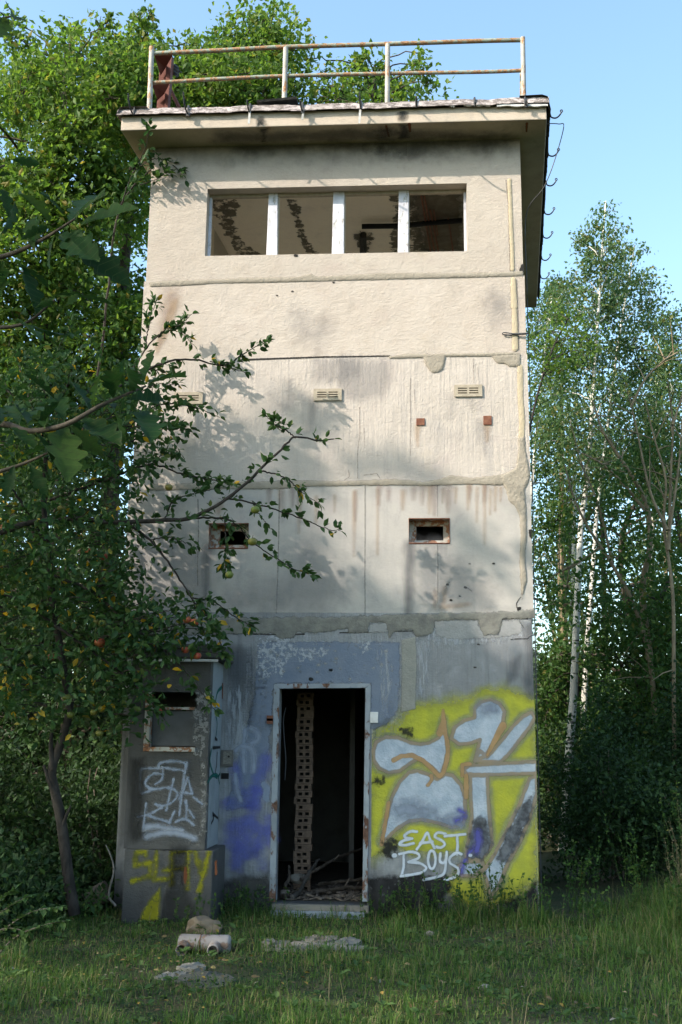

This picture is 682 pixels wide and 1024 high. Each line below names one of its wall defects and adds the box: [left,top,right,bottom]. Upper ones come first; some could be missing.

peeling [225,607,522,811]